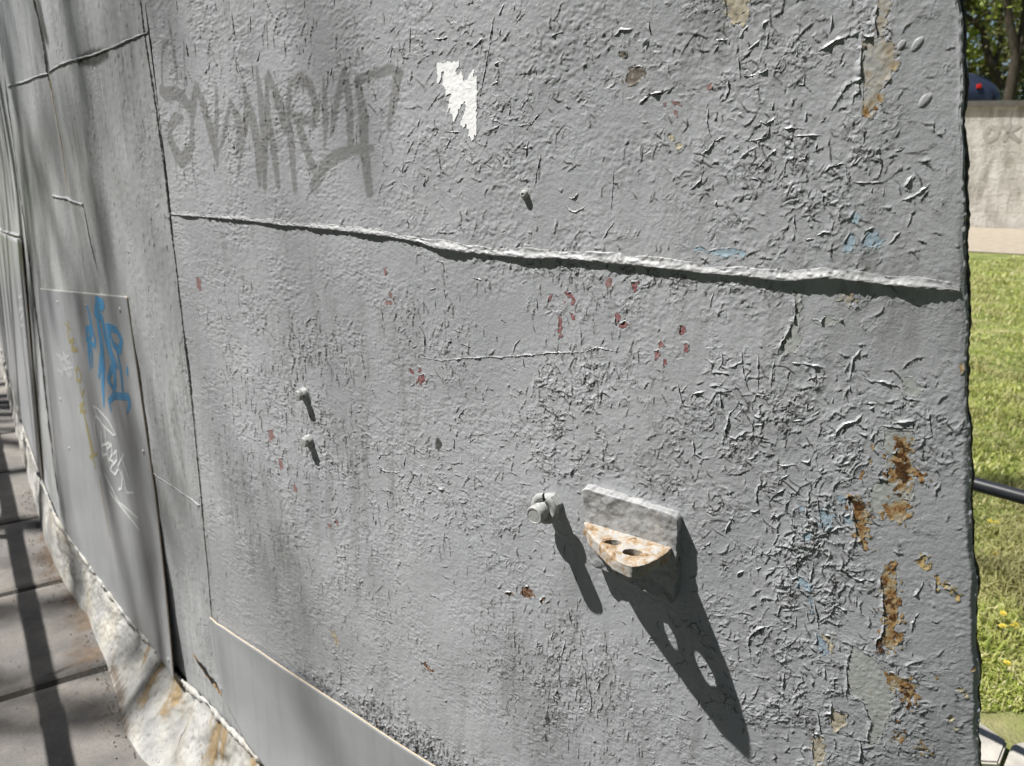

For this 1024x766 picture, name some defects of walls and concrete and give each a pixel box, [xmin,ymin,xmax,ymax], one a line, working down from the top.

peeling [722,0,752,28]
peeling [859,0,902,122]
crack [381,259,639,377]
peeling [546,291,578,339]
peeling [614,308,631,332]
corrosion [845,431,932,552]
peeling [868,426,920,526]
corrosion [875,558,906,658]
peeling [915,552,963,602]
peeling [810,709,849,766]
peeling [814,632,900,748]
corrosion [883,671,922,712]